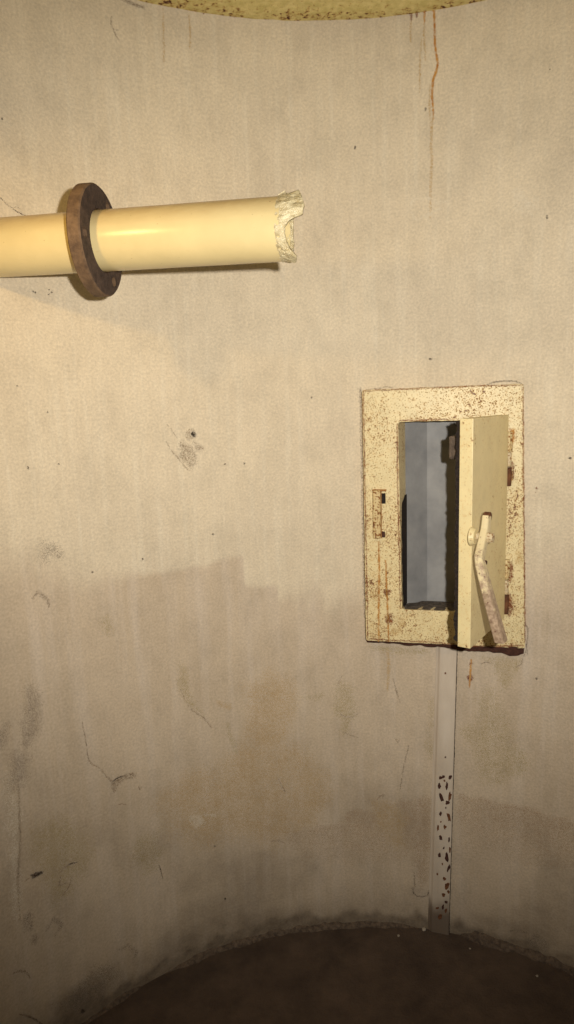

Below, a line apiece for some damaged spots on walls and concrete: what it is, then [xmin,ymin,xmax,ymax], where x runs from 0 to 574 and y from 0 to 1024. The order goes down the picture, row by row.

corrosion [409,10,439,219]
crack [83,727,142,805]